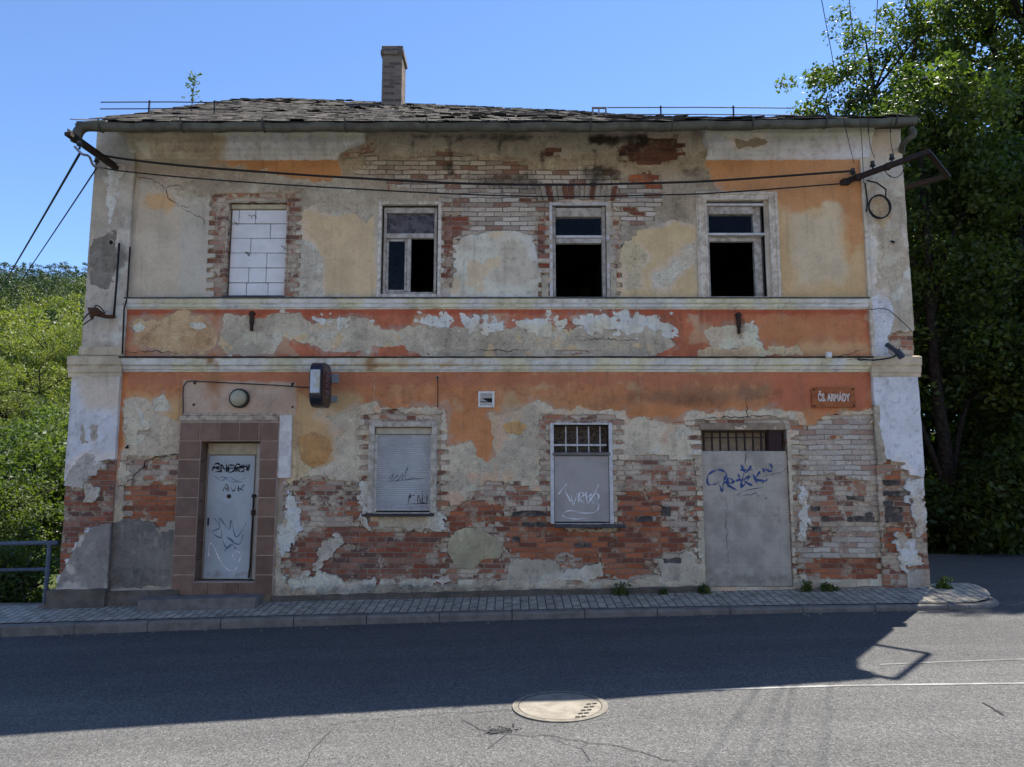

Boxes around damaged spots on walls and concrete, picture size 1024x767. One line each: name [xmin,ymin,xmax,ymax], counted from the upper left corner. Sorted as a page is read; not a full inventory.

water stain [588,132,648,155]
crack [136,176,206,227]
peeling [130,134,719,356]
peeling [698,320,803,356]
flaking render [57,394,181,583]
crack [118,454,179,487]
peeling [274,400,930,596]